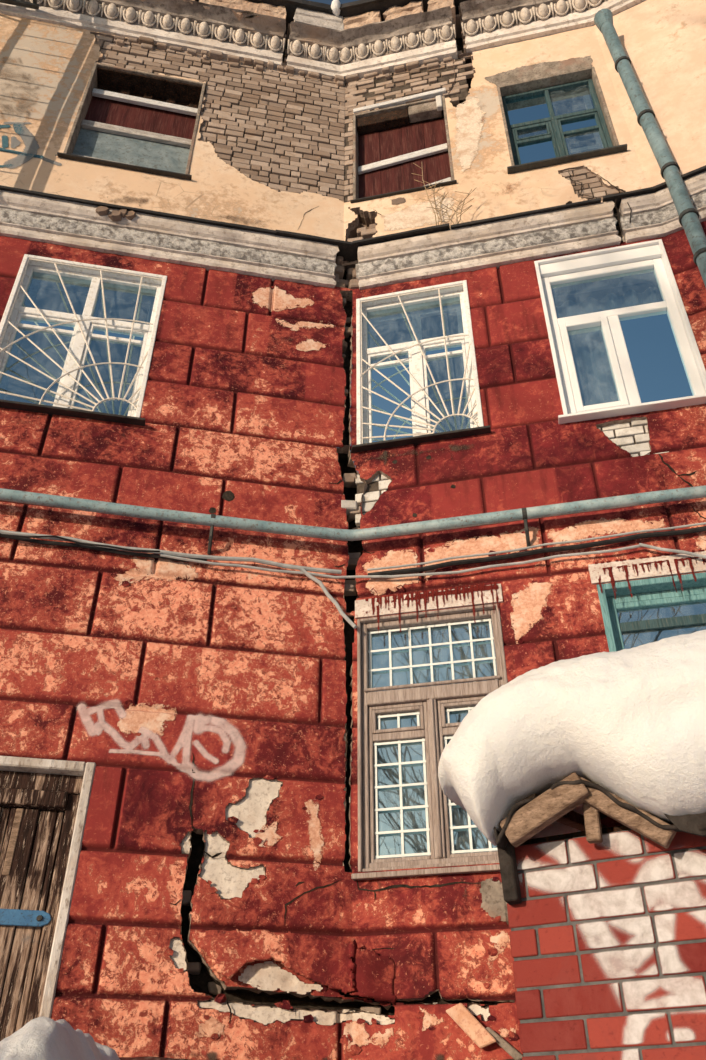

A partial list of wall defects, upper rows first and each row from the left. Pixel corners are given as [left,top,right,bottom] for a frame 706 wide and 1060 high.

flaking render [90,32,593,242]
peeling [250,286,334,352]
flaking render [596,416,666,457]
flaking render [355,460,397,528]
peeling [362,516,665,596]
crack [284,290,481,924]
peeling [510,580,552,644]
flaking render [225,775,283,847]
flaking render [180,827,266,900]
crack [170,753,516,1024]
flaking render [164,938,188,973]
flaking render [194,961,395,1055]